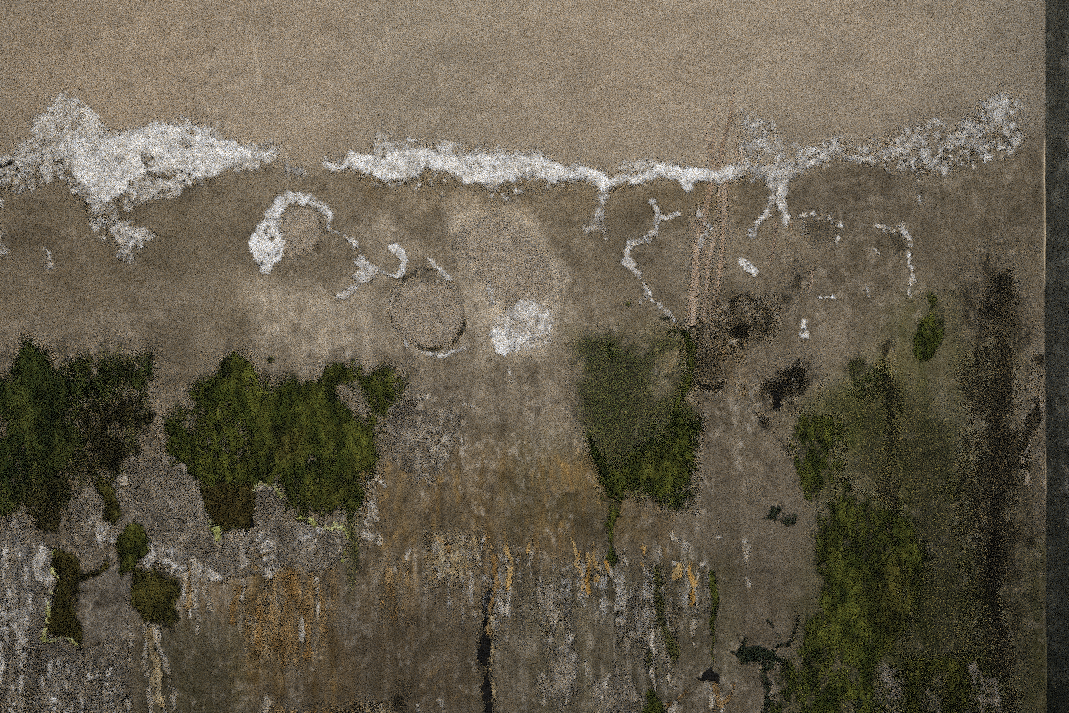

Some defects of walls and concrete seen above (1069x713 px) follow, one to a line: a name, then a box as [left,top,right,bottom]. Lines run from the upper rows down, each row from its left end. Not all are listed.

water stain [0,92,307,263]
efflorescence [248,191,408,300]
water stain [323,93,1024,326]
efflorescence [487,285,553,383]
peeling [360,475,386,546]
water stain [962,255,1042,675]
corrosion [141,625,177,713]
peeling [0,453,349,713]
corrosion [181,547,213,635]
corrosion [229,566,328,667]
corrosion [430,531,534,635]
crack [477,590,496,713]